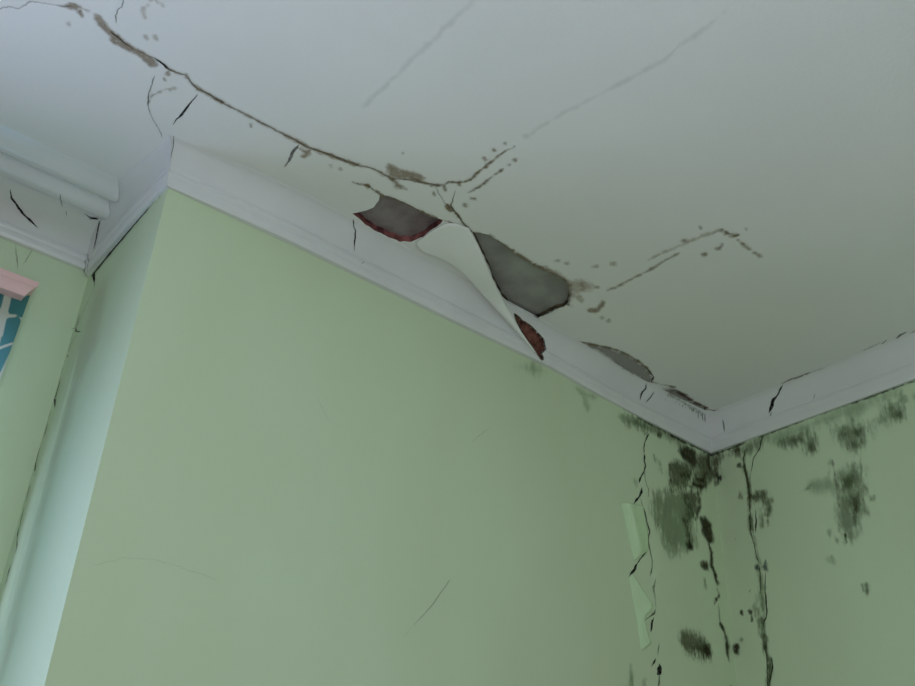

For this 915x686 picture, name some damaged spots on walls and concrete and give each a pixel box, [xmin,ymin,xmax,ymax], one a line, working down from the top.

crack [111,3,467,227]
crack [10,190,38,228]
flaking render [416,223,546,360]
peeling [582,342,654,382]
crack [629,434,653,577]
water stain [638,417,744,584]
water stain [751,490,771,517]
crack [742,385,783,686]
crack [646,609,662,686]
water stain [681,631,711,658]
water stain [719,623,739,658]